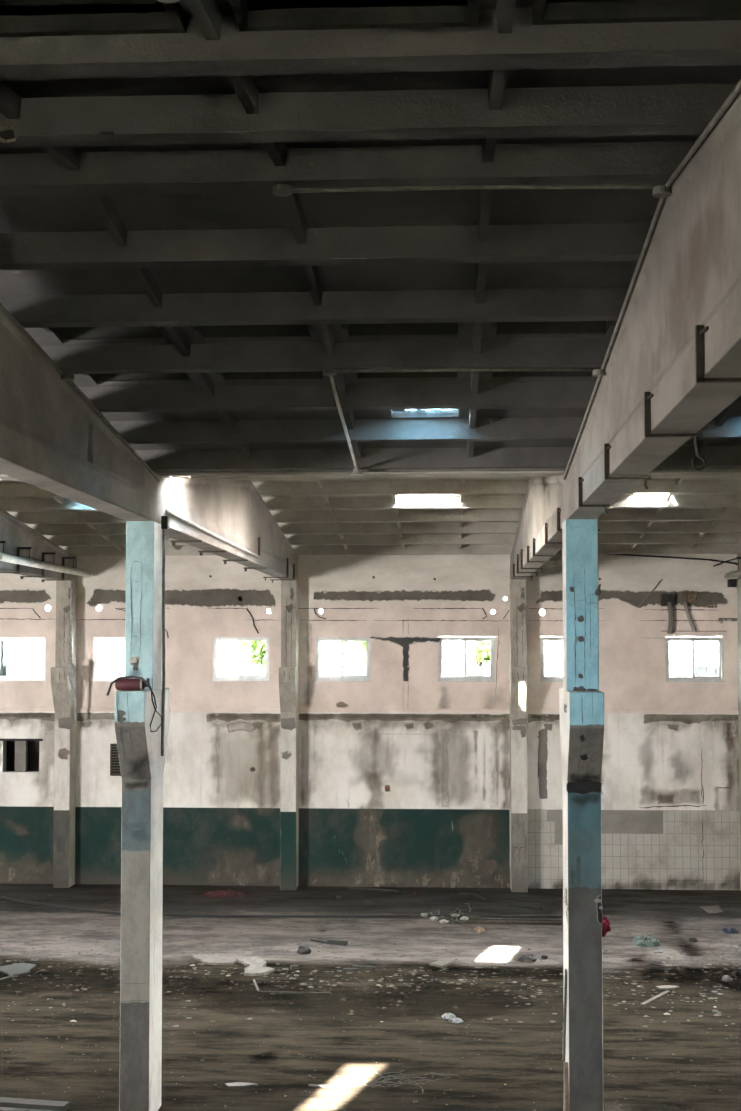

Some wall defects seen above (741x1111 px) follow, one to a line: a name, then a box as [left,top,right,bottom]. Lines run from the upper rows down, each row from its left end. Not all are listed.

spalling [0,587,71,614]
spalling [86,588,126,612]
spalling [165,575,296,615]
spalling [595,578,737,624]
leakage [429,719,477,807]
leakage [496,759,510,809]
spalling [566,780,602,794]